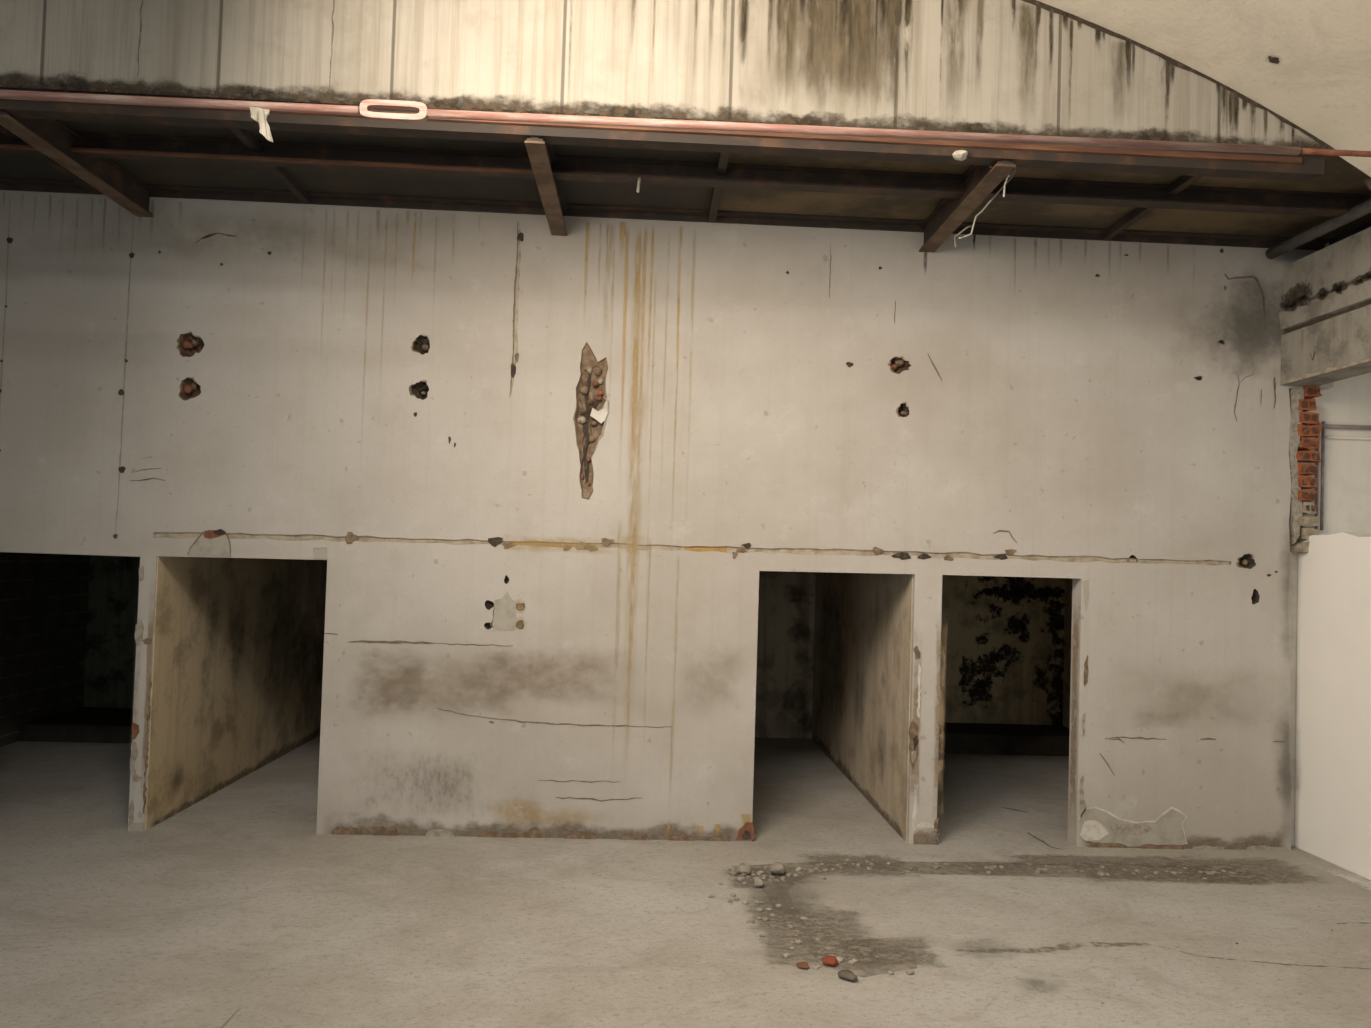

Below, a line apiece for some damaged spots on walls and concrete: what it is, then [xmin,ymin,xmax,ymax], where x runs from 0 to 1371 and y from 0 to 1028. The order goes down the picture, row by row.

leakage [695,0,748,40]
leakage [770,0,912,72]
leakage [941,0,983,59]
leakage [1012,0,1105,70]
leakage [1117,39,1135,79]
leakage [1216,84,1294,139]
corrosion [621,223,654,396]
flaking render [573,342,609,500]
flaking render [1282,359,1371,553]
leakage [958,576,1065,725]
corrosion [736,815,755,840]
flaking render [1079,775,1289,851]